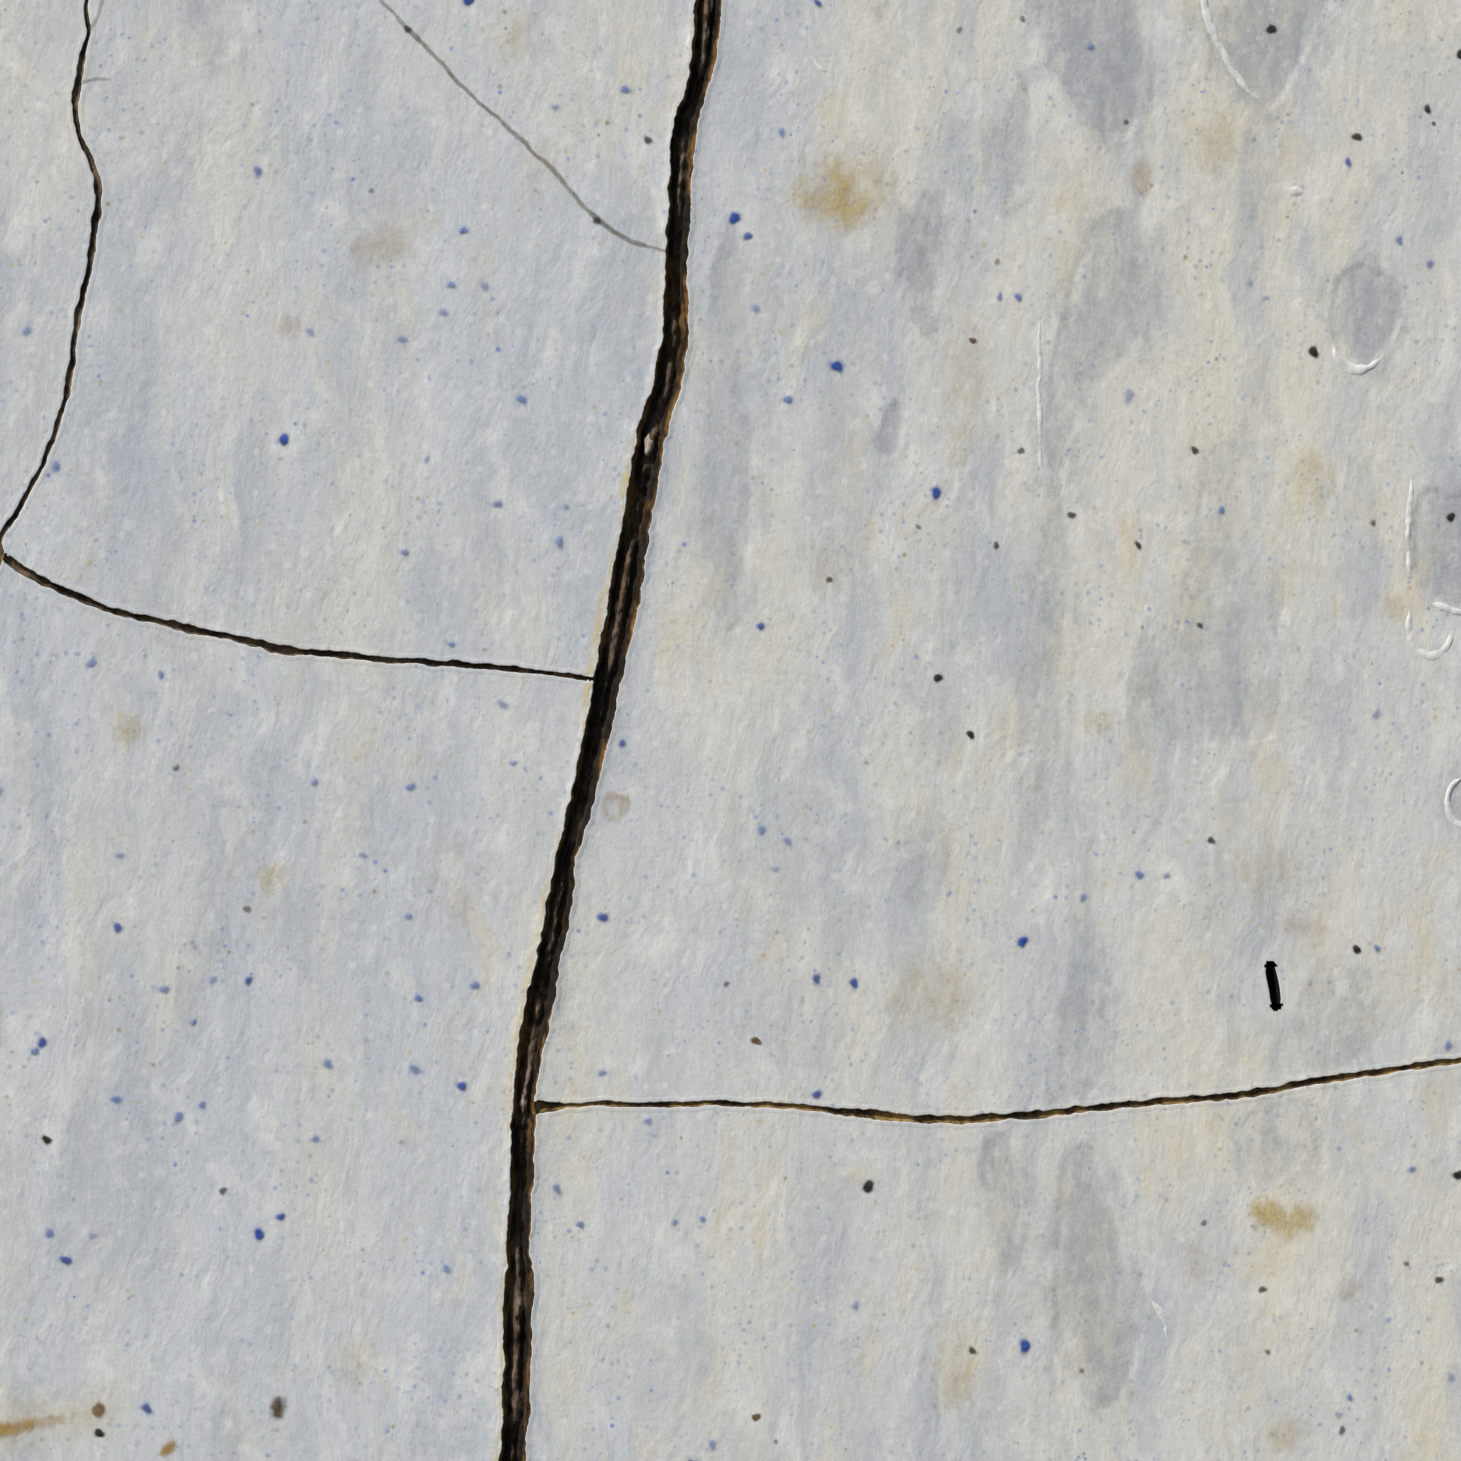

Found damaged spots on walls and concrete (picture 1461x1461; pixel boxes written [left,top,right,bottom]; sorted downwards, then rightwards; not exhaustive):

crack [0,0,594,685]
crack [493,0,1461,1461]
rust [0,1420,32,1435]
rust [92,1403,105,1416]